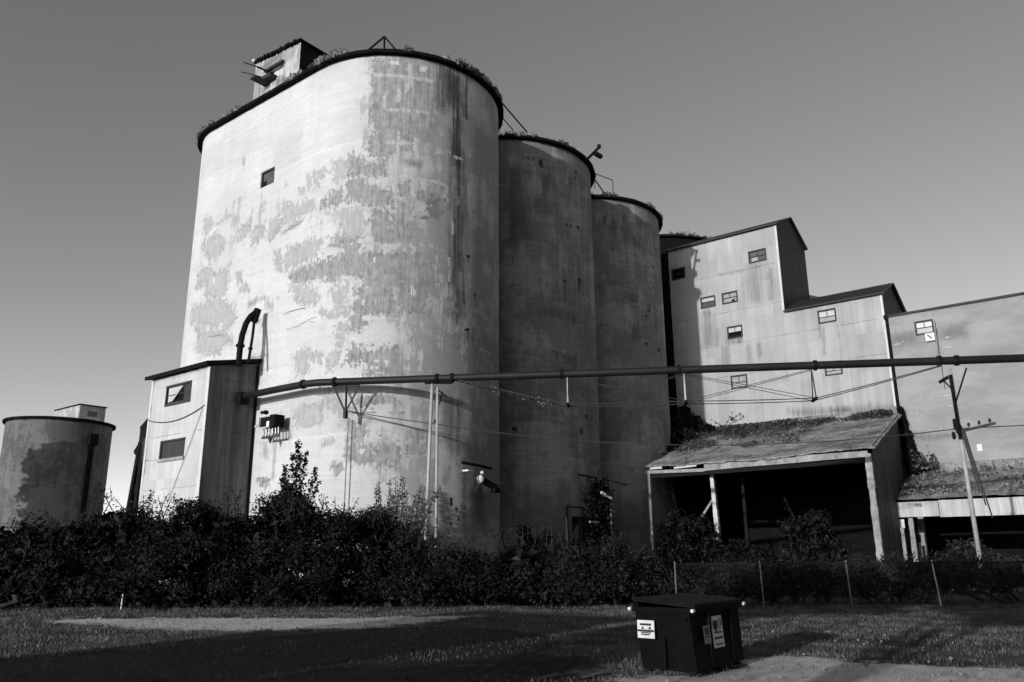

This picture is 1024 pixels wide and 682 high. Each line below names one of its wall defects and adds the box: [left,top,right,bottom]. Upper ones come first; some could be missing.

peeling [154,56,461,382]
damp [355,61,493,353]